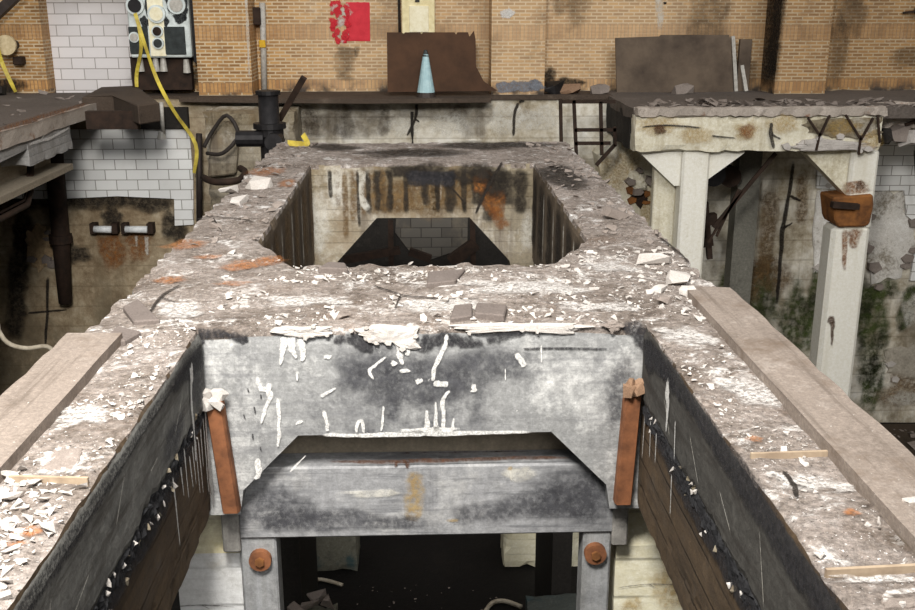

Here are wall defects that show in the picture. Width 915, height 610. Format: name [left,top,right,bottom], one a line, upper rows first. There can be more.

spalling [781,114,915,155]
leakage [267,171,579,269]
corrosion [842,229,860,265]
spalling [867,191,915,291]
spalling [270,325,333,341]
spalling [349,324,421,352]
spalling [449,321,625,335]
leakage [256,377,281,446]
leakage [322,335,527,438]
leakage [610,371,629,419]
leakage [254,458,262,479]